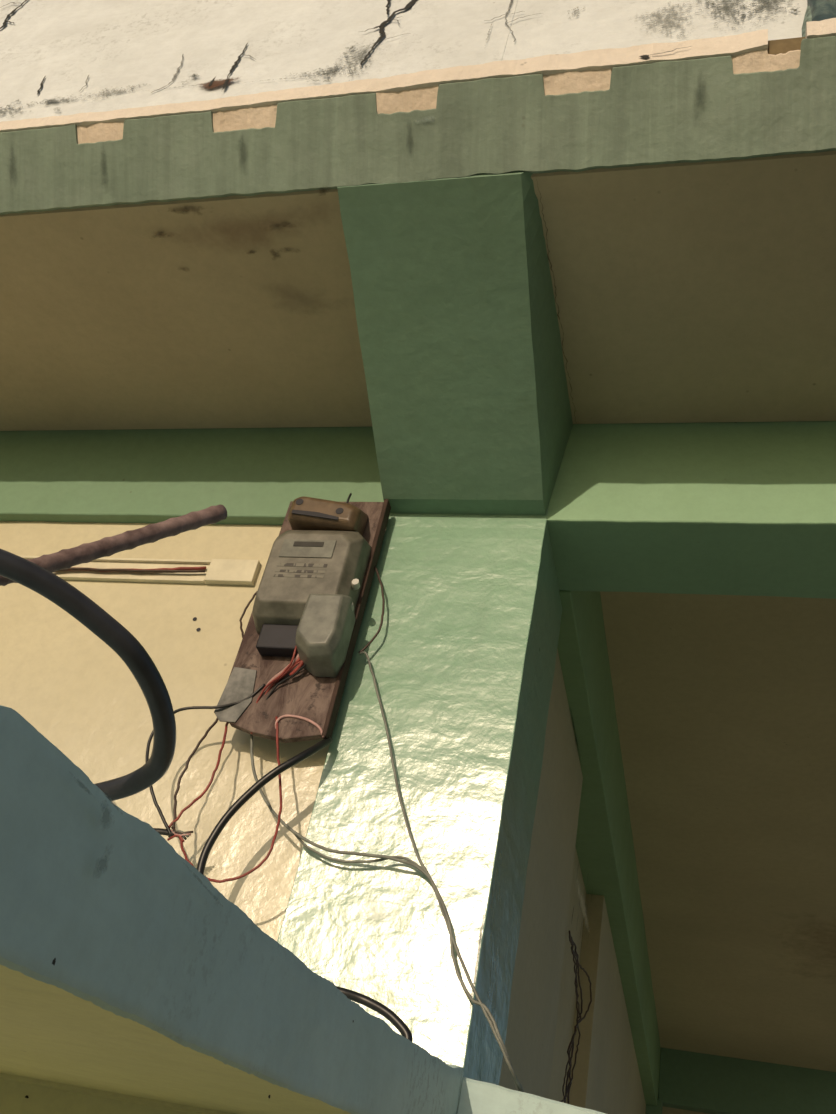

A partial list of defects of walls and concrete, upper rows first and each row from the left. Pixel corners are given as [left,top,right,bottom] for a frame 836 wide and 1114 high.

crack [0,0,27,29]
crack [360,0,417,65]
crack [484,0,540,41]
water stain [636,0,797,36]
crack [151,55,184,93]
crack [227,43,255,79]